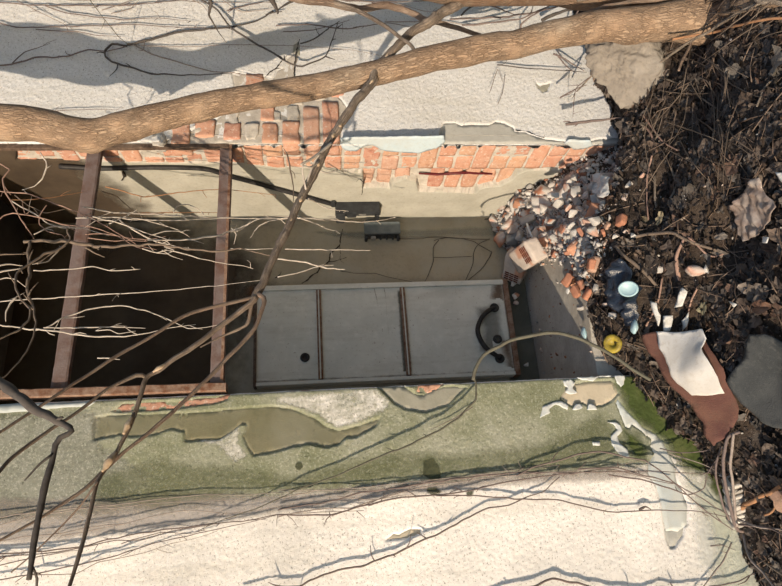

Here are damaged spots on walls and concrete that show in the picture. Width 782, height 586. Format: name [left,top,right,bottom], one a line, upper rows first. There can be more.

spalling [233,42,300,86]
flaking render [17,150,87,161]
flaking render [102,93,619,187]
damp [0,143,85,389]
damp [70,185,216,387]
damp [226,242,259,355]
crack [303,229,347,283]
flaking render [95,394,379,455]
damp [0,279,759,586]
flaking render [378,384,464,412]
peeling [540,375,687,548]